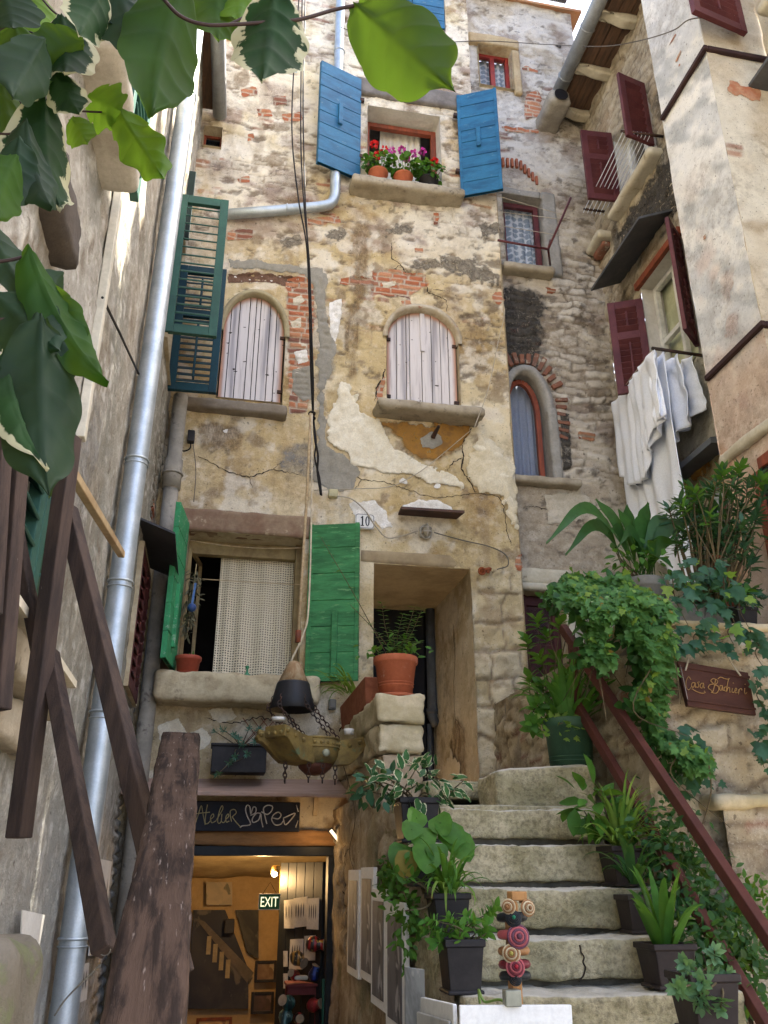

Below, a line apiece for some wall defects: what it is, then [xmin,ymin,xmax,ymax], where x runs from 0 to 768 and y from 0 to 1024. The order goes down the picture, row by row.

flaking render [727,80,761,101]
flaking render [340,248,505,306]
flaking render [227,272,315,414]
crack [198,456,301,488]
peeling [327,382,464,510]
crack [356,428,547,542]
crack [578,945,586,982]